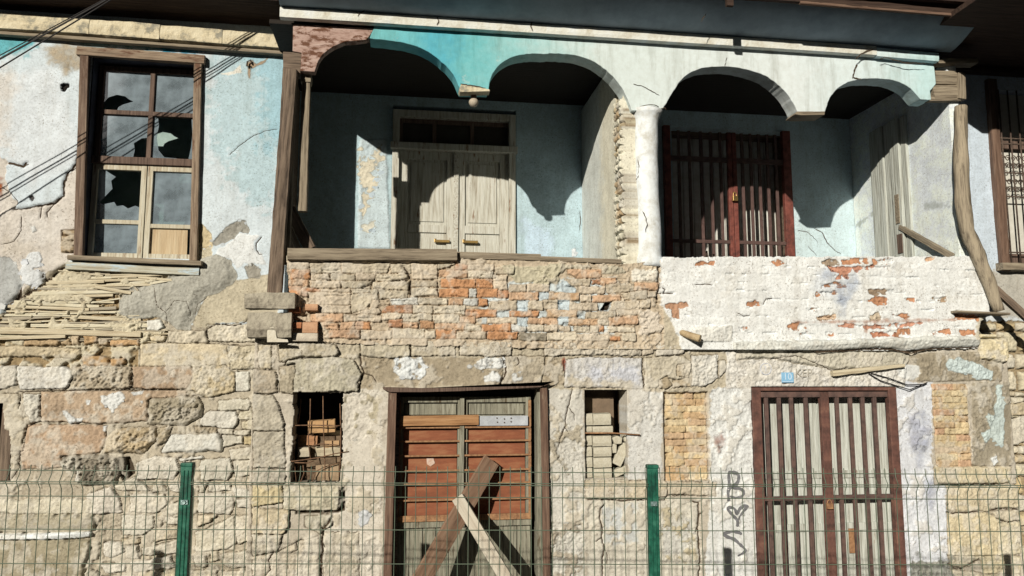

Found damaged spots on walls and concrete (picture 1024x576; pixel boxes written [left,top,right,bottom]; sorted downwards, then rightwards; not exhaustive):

crack [852,49,922,80]
flaking render [356,145,385,233]
flaking render [199,218,250,250]
flaking render [244,263,261,279]
peeling [665,302,688,319]
peeling [787,258,979,339]
peeling [946,357,1006,465]